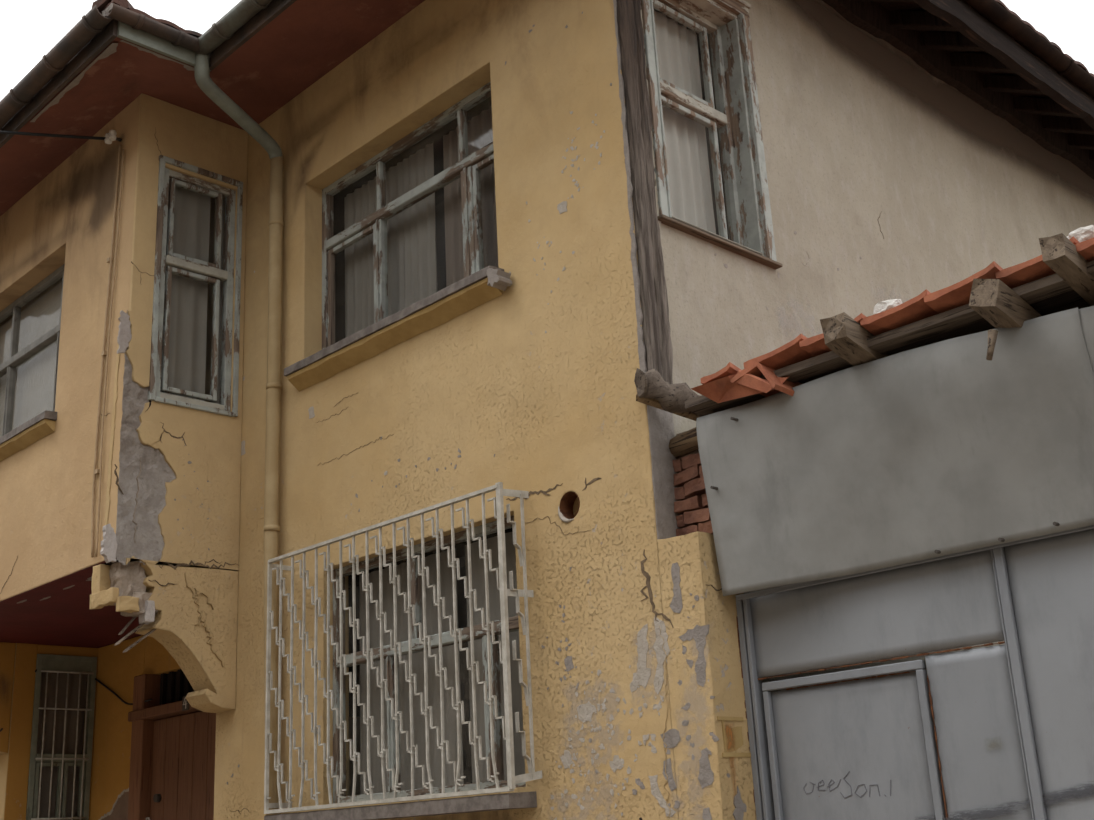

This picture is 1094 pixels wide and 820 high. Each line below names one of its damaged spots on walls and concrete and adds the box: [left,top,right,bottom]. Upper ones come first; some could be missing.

crack [145,400,187,446]
flaking render [63,310,195,653]
crack [506,478,602,535]
crack [149,559,239,667]
peeling [541,562,719,820]
crack [640,549,673,820]
peeling [727,773,747,820]